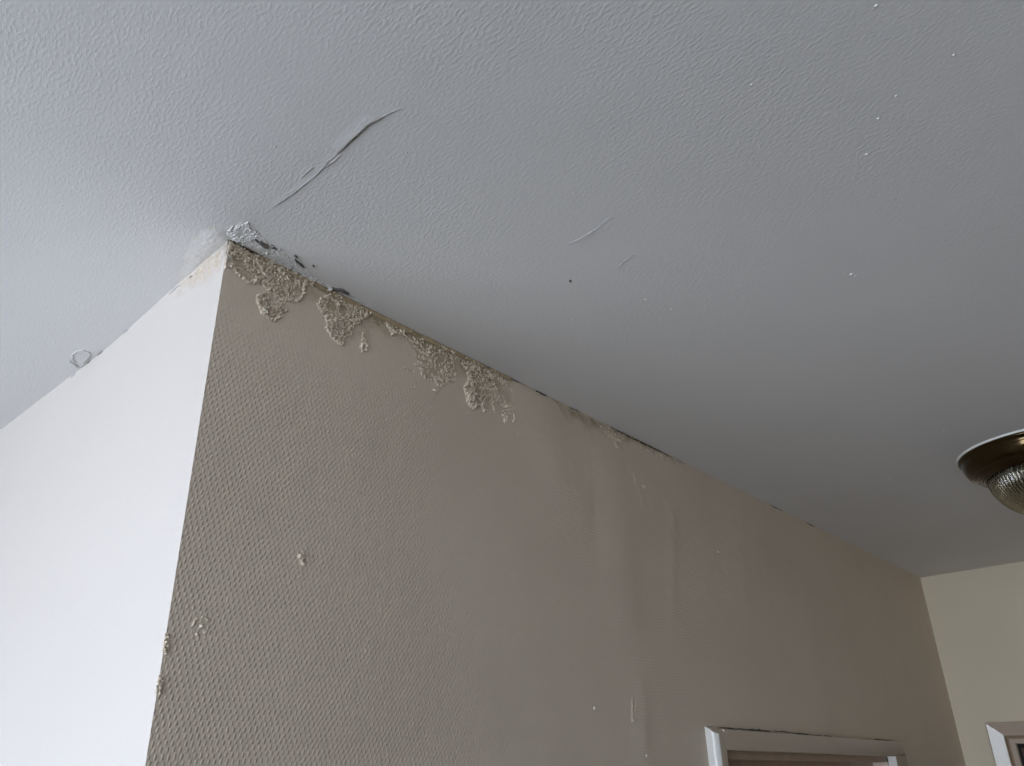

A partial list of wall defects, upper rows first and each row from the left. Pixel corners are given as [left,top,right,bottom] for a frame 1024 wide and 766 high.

crack [271,105,401,207]
peeling [224,222,372,353]
peeling [384,322,524,439]